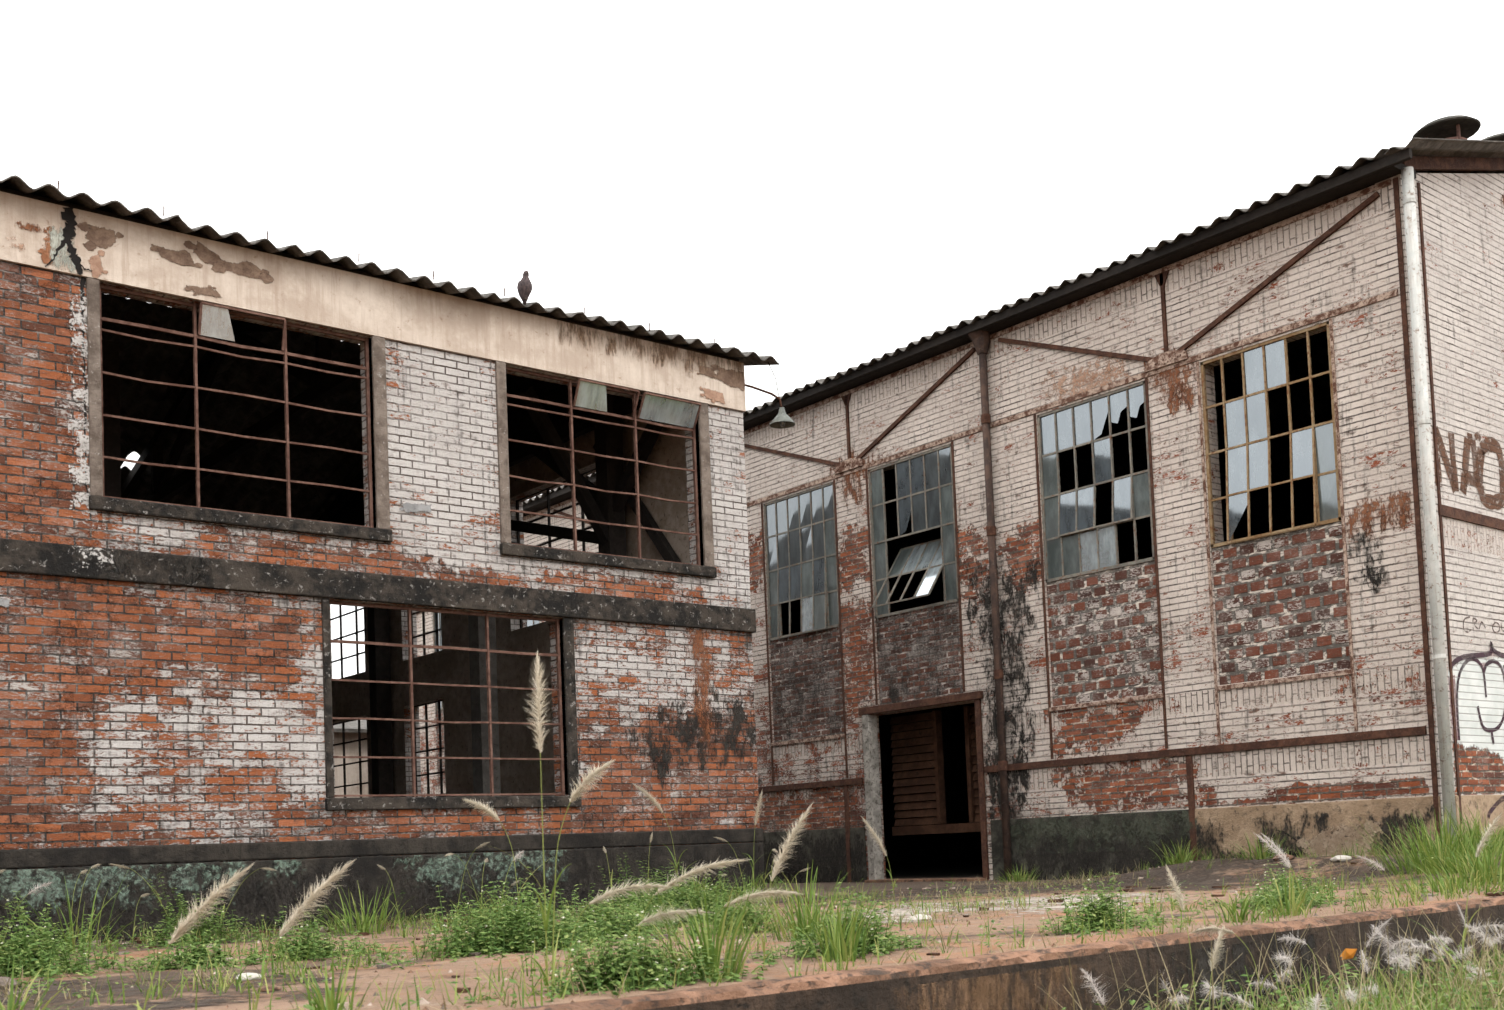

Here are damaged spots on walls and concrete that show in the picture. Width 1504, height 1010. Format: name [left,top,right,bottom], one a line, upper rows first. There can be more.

spalling [77,222,124,278]
spalling [150,241,274,297]
peeling [0,226,102,547]
crack [45,207,92,493]
mould [1348,529,1389,594]
peeling [0,572,323,848]
water stain [625,685,756,789]
water stain [965,554,1043,819]
peeling [1043,701,1429,814]
peeling [1452,742,1504,795]
peeling [0,861,245,916]
water stain [0,802,1435,948]